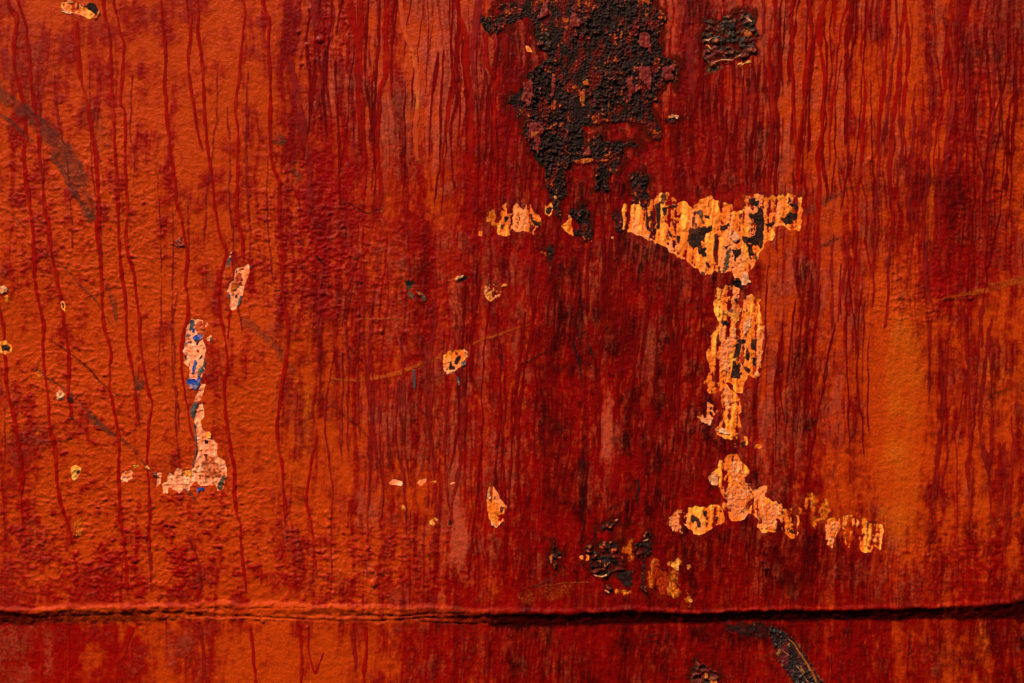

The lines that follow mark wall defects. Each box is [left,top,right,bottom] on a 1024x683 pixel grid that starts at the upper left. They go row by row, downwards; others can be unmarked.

peeling [61,0,100,19]
corrosion [698,6,760,73]
corrosion [480,0,683,243]
peeling [479,203,555,266]
peeling [224,252,251,310]
peeling [443,349,468,375]
peeling [611,192,884,553]
peeling [120,319,227,494]
peeling [486,483,507,528]
corrosion [547,537,566,572]
corrosion [579,514,657,587]